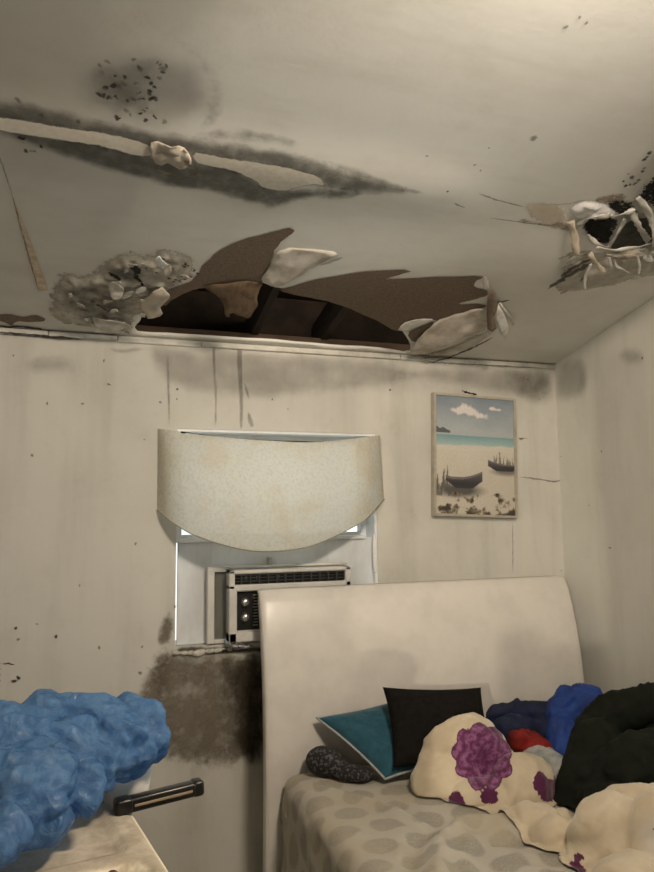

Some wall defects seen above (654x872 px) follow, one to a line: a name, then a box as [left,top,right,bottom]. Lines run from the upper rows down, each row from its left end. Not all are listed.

water stain [0,59,403,204]
mould [139,653,263,763]